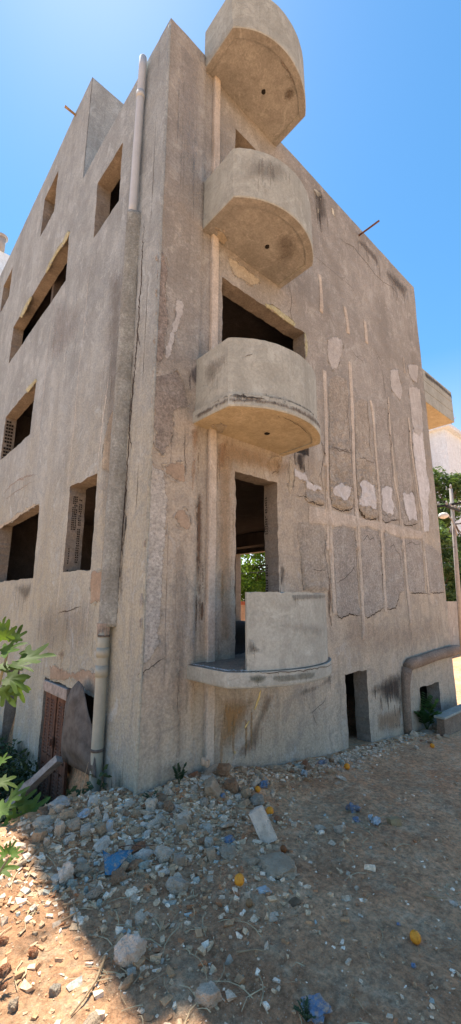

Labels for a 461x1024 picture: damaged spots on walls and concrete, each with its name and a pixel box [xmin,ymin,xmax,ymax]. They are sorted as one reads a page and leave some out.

crack [98,221,145,612]
spalling [139,252,192,664]
peeling [287,363,431,533]
leakage [375,677,400,716]